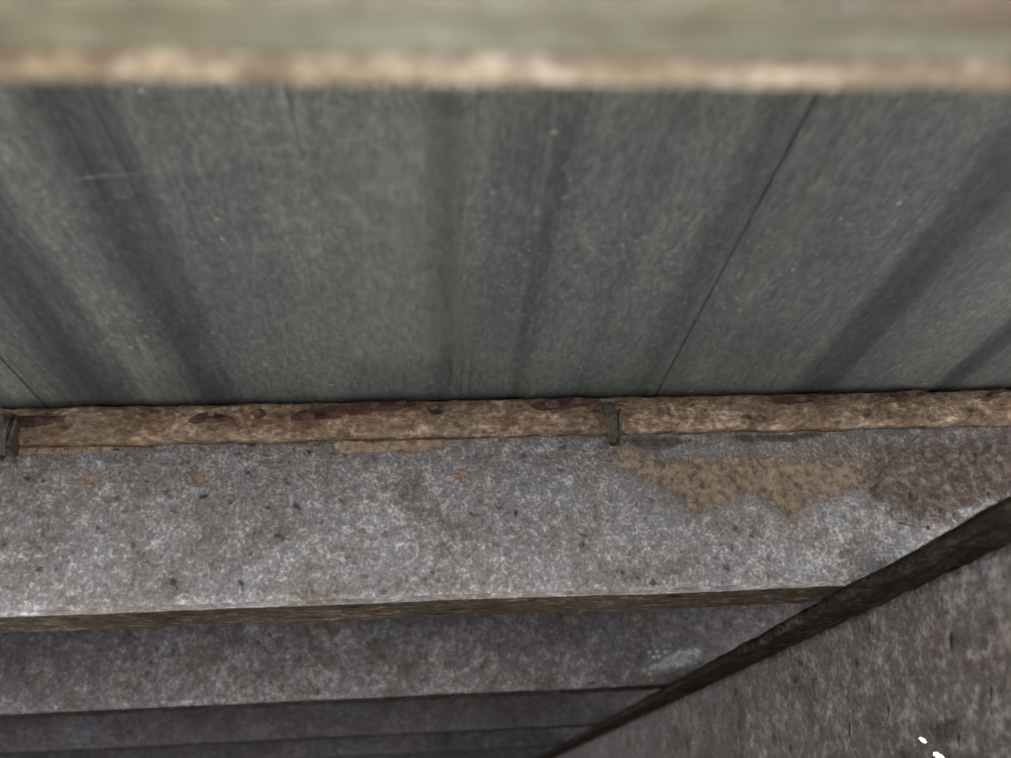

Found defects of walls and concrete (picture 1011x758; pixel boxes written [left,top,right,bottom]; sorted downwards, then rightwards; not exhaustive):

corrosion [292,400,416,421]
corrosion [530,397,597,411]
corrosion [9,416,64,428]
corrosion [188,412,235,430]
corrosion [606,433,1011,522]